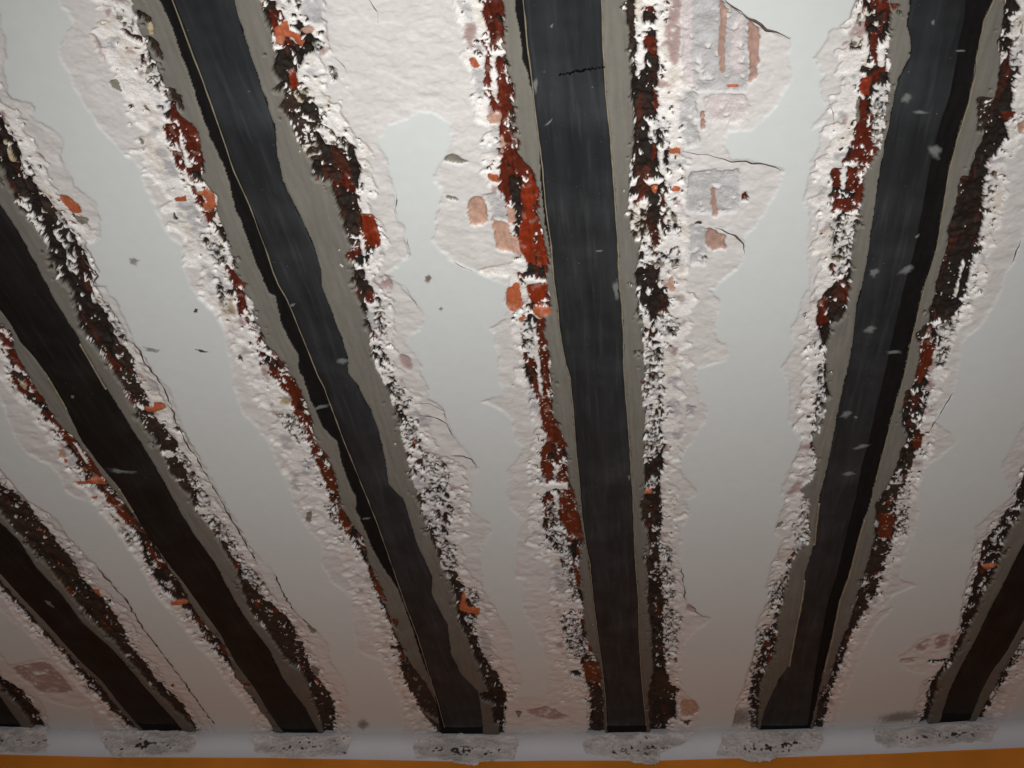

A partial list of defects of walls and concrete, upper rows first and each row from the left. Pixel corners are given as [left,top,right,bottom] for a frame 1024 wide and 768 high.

spalling [0,15,351,734]
spalling [60,0,785,735]
crack [683,151,780,170]
spalling [732,0,1024,731]